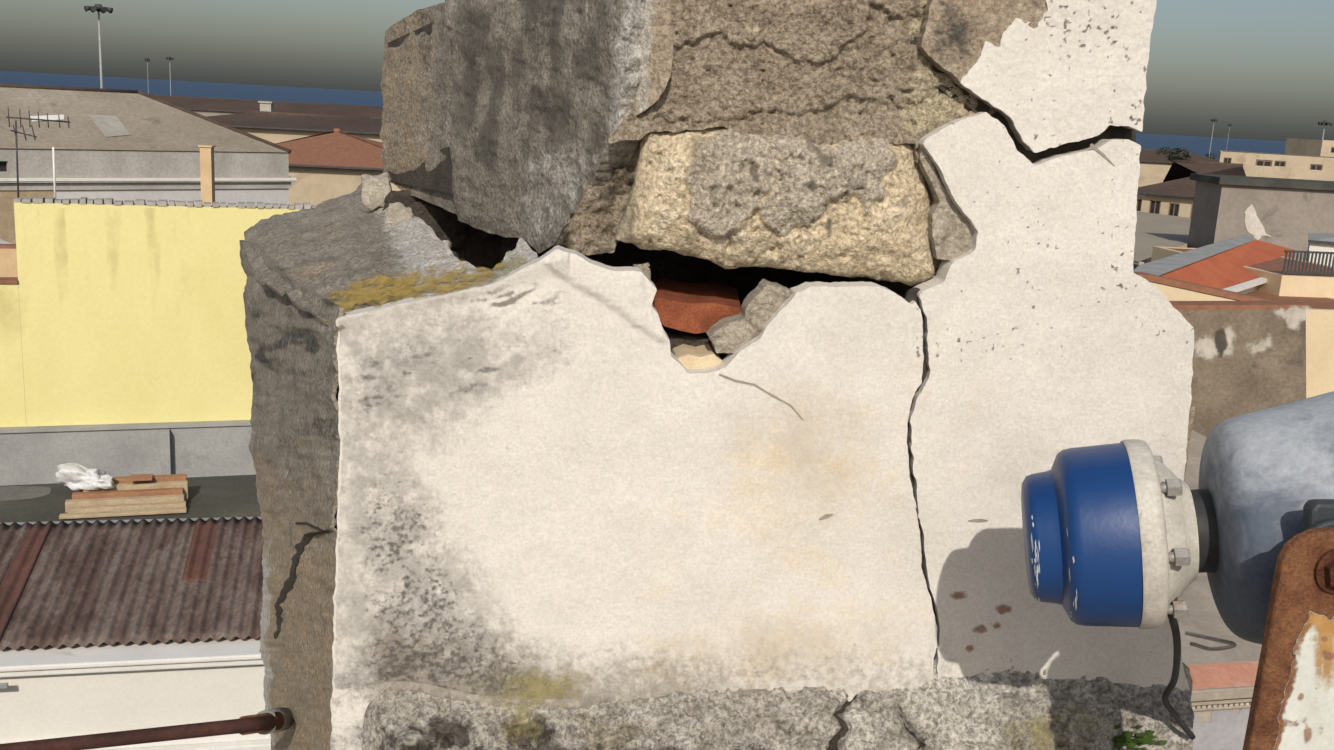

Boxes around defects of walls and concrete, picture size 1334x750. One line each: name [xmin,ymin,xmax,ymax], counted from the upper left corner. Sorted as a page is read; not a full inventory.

crack [910,37,1136,166]
peeling [0,190,54,244]
spalling [500,0,1047,369]
damp [493,291,530,306]
peeling [1194,326,1272,359]
peeling [1275,306,1310,330]
crack [905,287,937,660]
corrosion [0,521,53,641]
corrosion [181,519,218,583]
damp [366,501,516,694]
crack [826,694,857,750]
corrosion [1274,612,1334,750]